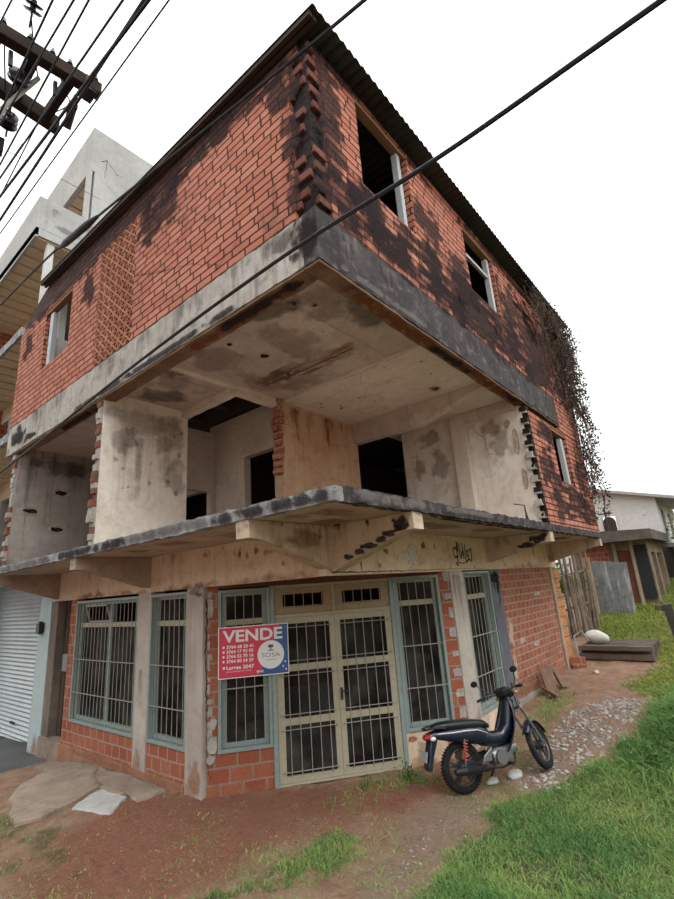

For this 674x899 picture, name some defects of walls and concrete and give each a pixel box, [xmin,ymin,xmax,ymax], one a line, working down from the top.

leakage [136,62,317,262]
leakage [312,45,570,408]
spalling [263,346,353,386]
peeling [206,716,218,765]